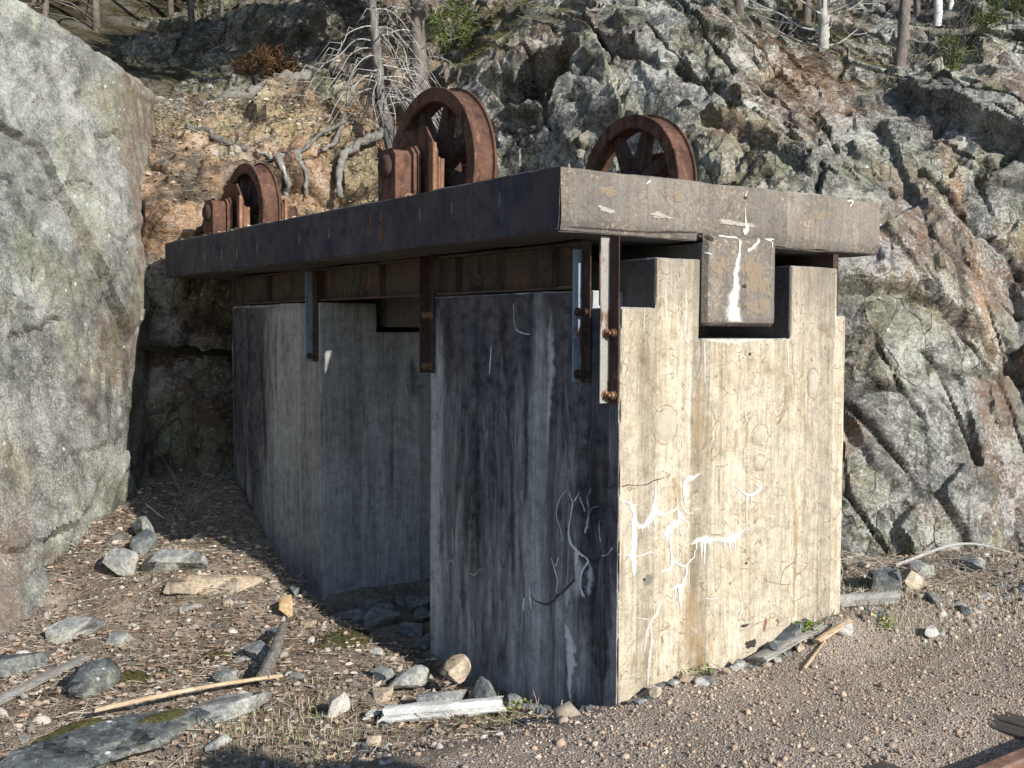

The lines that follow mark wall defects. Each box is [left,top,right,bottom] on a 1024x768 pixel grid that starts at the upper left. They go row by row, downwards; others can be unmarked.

water stain [546,325,554,444]
water stain [556,561,592,621]